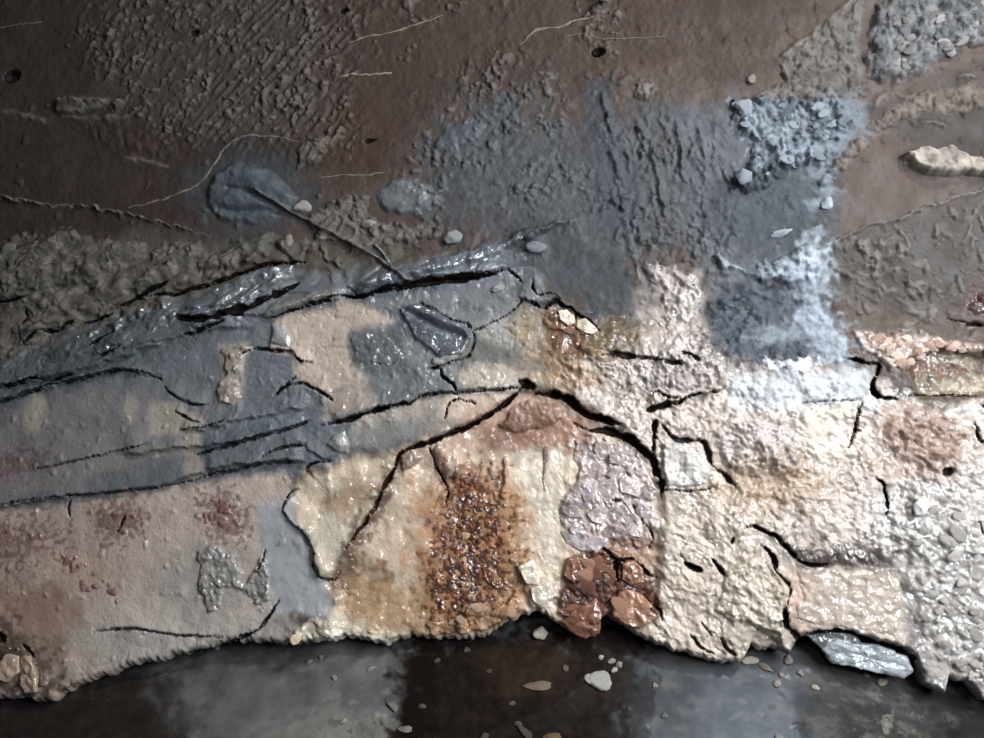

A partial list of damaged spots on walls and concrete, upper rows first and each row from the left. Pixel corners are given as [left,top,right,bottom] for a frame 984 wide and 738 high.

damp [419,88,867,401]
crack [0,260,736,583]
corrosion [482,404,580,451]
crack [806,357,984,448]
corrosion [909,348,984,398]
crack [876,478,890,515]
crack [96,600,280,654]
corrosion [329,456,663,738]
crack [684,559,726,593]
crack [731,525,918,676]
damp [0,673,186,738]
damp [924,689,984,738]